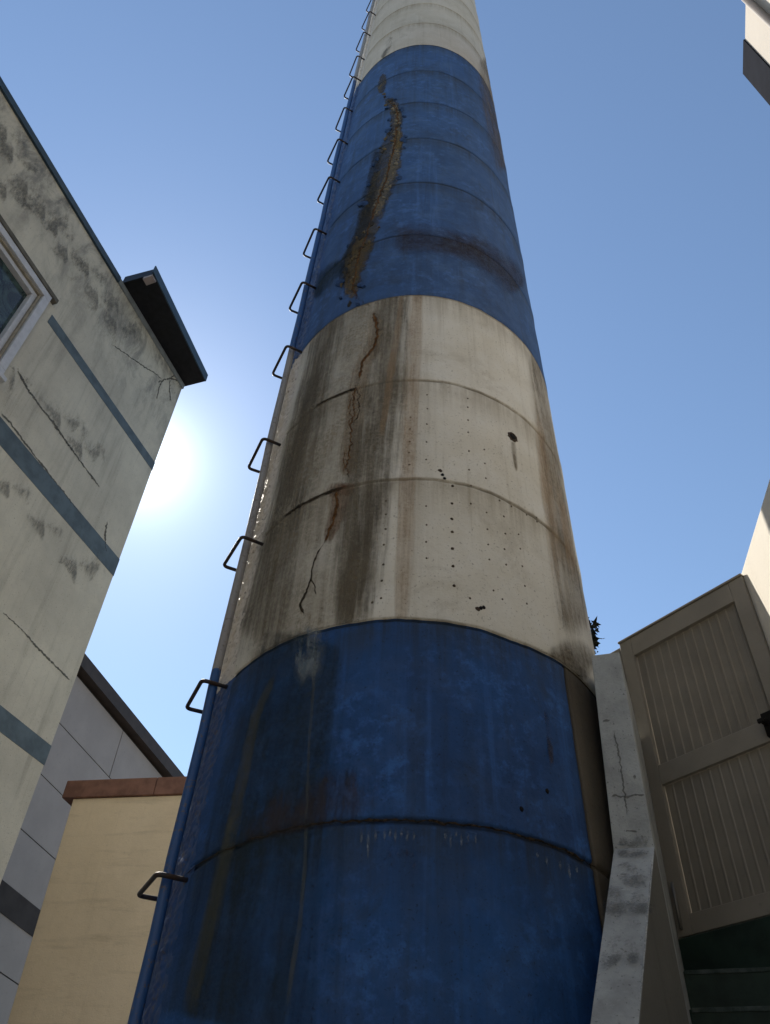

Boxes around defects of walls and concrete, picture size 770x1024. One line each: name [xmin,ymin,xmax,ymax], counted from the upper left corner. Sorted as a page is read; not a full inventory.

peeling [335,74,408,307]
crack [2,414,76,508]
crack [18,372,99,486]
crack [115,346,177,400]
crack [285,313,382,613]
water stain [533,365,584,622]
crack [5,614,69,680]
crack [603,719,644,832]